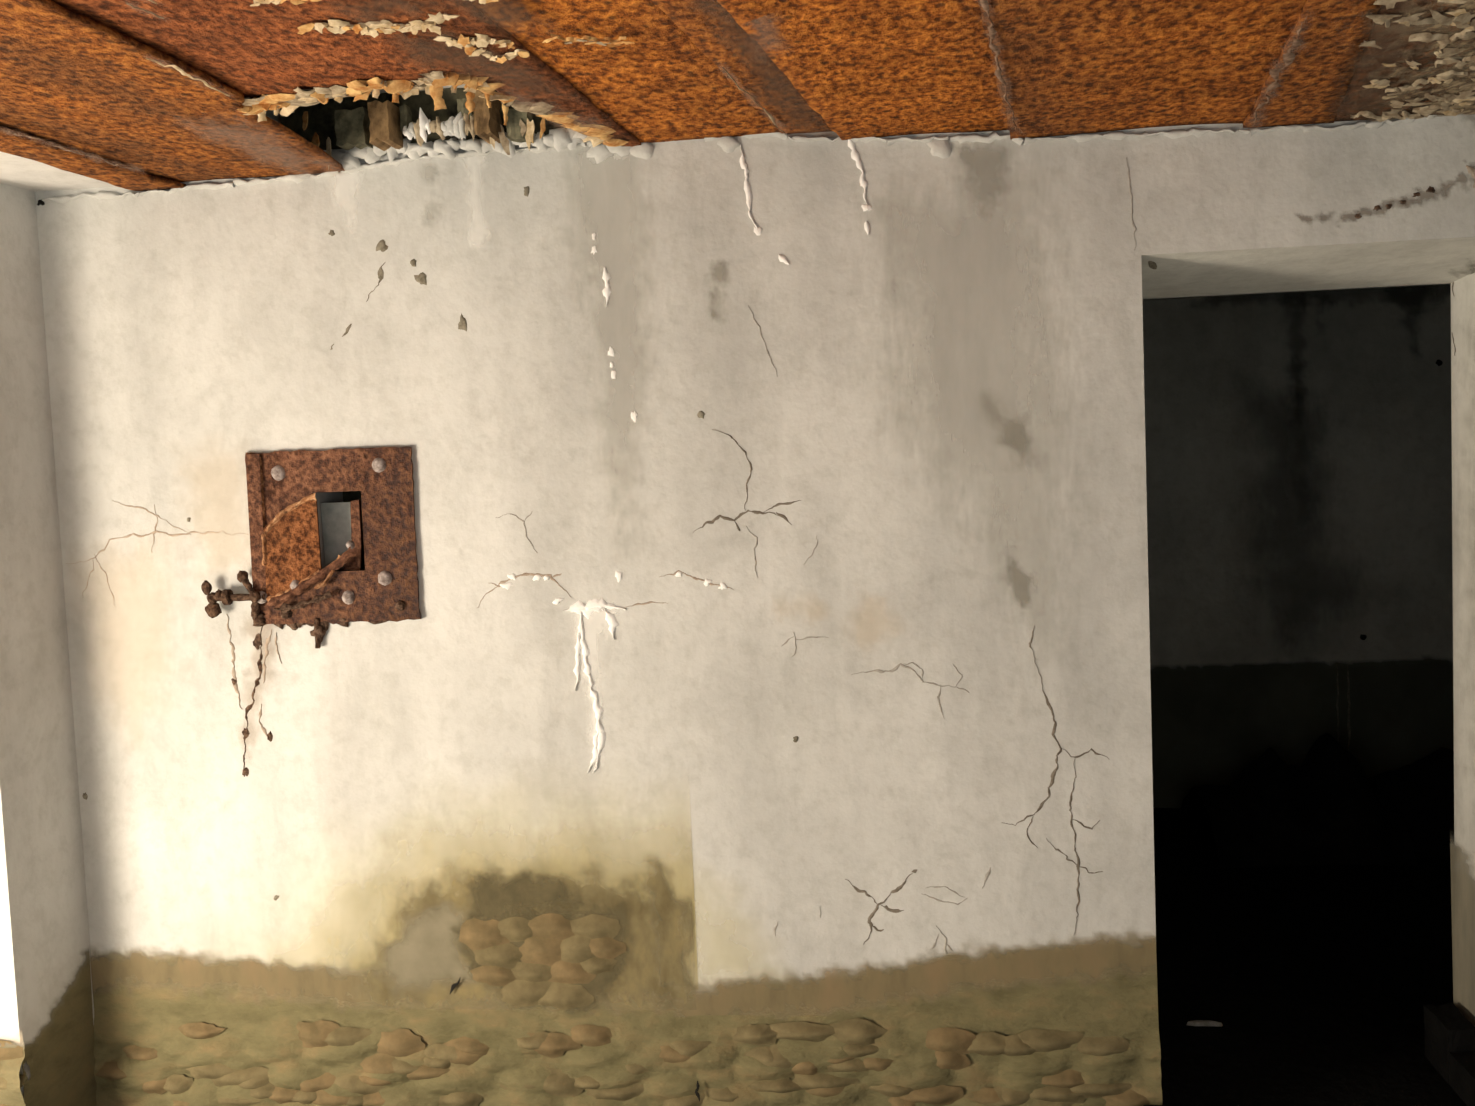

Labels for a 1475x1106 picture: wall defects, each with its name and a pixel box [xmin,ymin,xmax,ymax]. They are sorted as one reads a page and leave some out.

peeling [237,0,636,170]
peeling [1337,0,1475,122]
leakage [1209,285,1451,413]
crack [72,500,248,606]
crack [477,512,571,608]
crack [615,430,818,607]
rust [226,614,282,777]
efflorescence [562,598,626,773]
crack [1005,629,1109,934]
leakage [0,848,1162,1106]
crack [845,867,991,955]